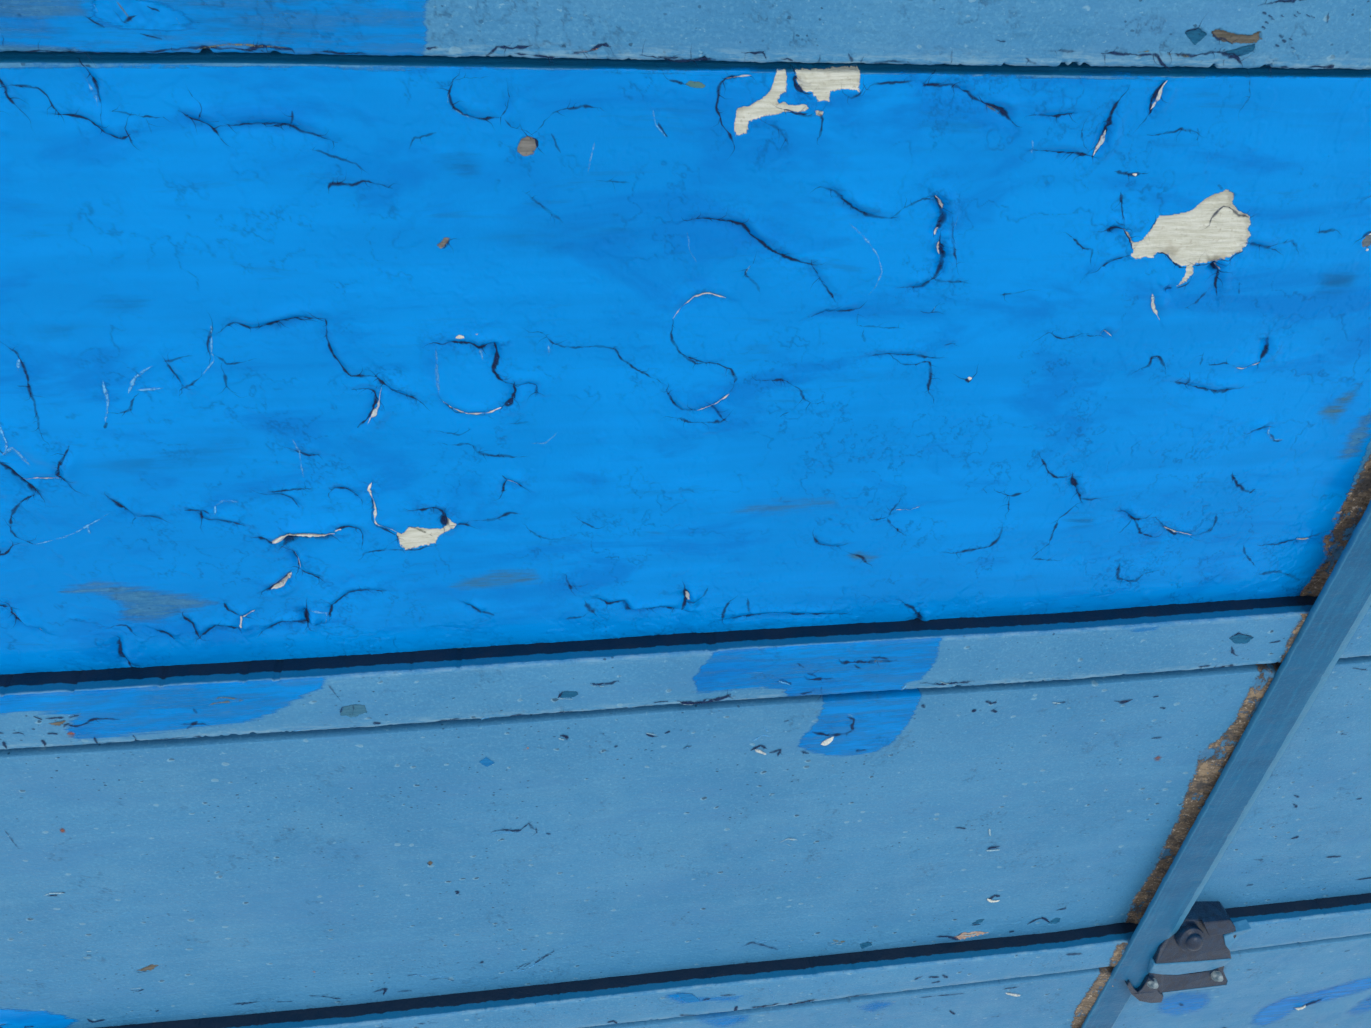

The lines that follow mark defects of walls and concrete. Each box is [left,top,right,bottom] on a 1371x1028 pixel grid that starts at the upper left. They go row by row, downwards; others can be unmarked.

crack [0,38,390,189]
crack [488,43,792,152]
peeling [734,65,863,135]
crack [850,0,1334,158]
crack [540,187,957,423]
peeling [1123,189,1251,320]
crack [164,316,426,428]
crack [1147,338,1268,392]
crack [0,463,244,555]
peeling [254,483,472,552]
crack [1036,460,1152,560]
crack [117,547,382,667]